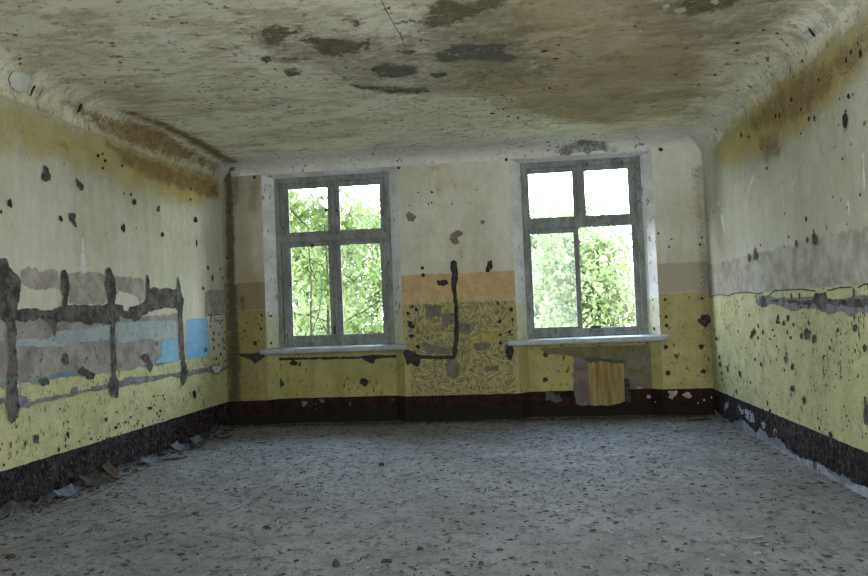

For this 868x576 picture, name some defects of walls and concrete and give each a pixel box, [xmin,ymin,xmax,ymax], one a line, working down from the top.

water stain [218,0,814,156]
water stain [709,0,868,205]
water stain [0,82,261,401]
peeling [58,394,167,452]
peeling [0,256,228,409]
peeling [396,302,472,378]
peeling [474,308,514,372]
peeling [541,345,656,406]
peeling [668,390,712,404]
peeling [724,389,868,499]
peeling [745,294,868,381]
peeling [53,483,80,496]